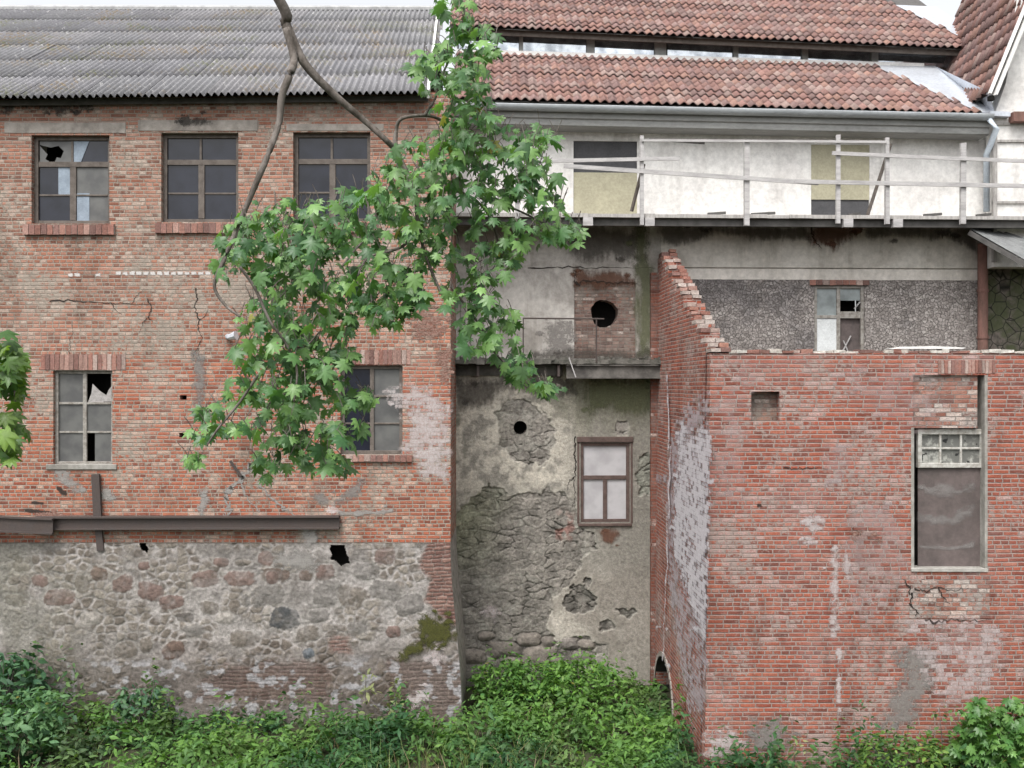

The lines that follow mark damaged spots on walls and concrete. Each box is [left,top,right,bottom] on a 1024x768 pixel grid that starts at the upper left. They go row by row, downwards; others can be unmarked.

crack [49,292,154,354]
crack [193,288,208,357]
peeling [494,398,557,466]
peeling [456,483,637,687]
peeling [635,392,714,721]
crack [905,580,992,623]
leakage [423,644,447,666]